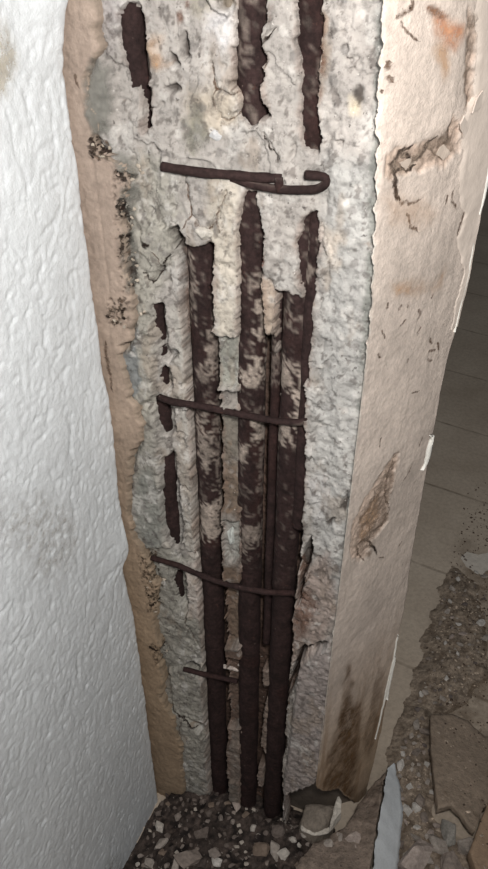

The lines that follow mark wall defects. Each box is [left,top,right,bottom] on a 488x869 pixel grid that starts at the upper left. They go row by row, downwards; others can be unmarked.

crack [389,118,453,205]
spalling [88,0,395,826]
peeling [404,434,434,479]
flaking render [460,552,488,575]
peeling [436,576,468,656]
peeling [375,635,399,739]
leakage [324,706,360,798]